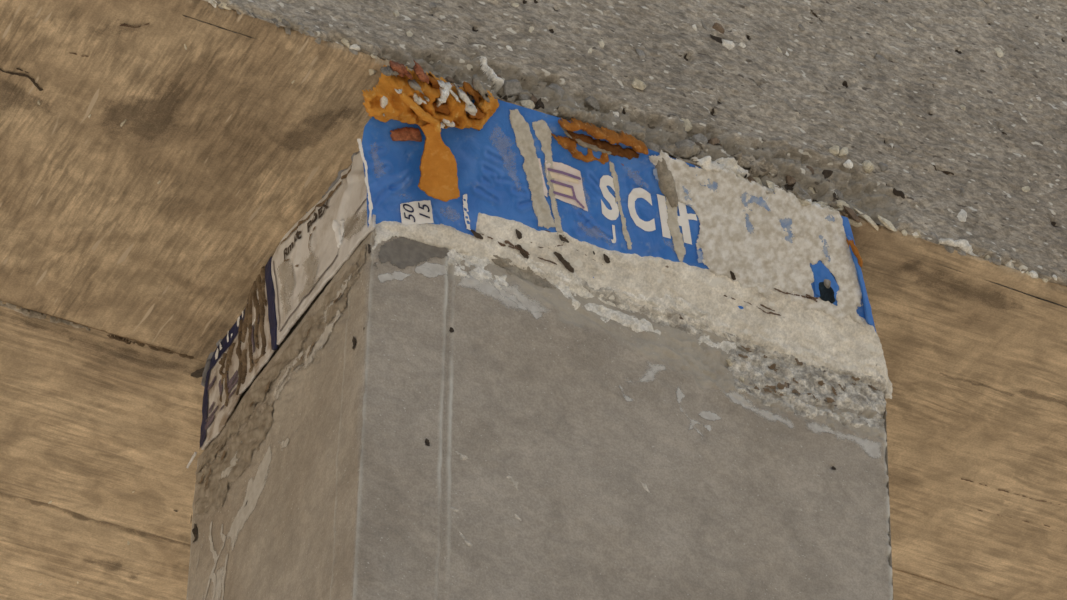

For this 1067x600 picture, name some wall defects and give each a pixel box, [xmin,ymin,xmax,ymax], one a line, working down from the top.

crack [0,68,43,91]
spalling [479,57,1057,283]
spalling [191,221,889,543]